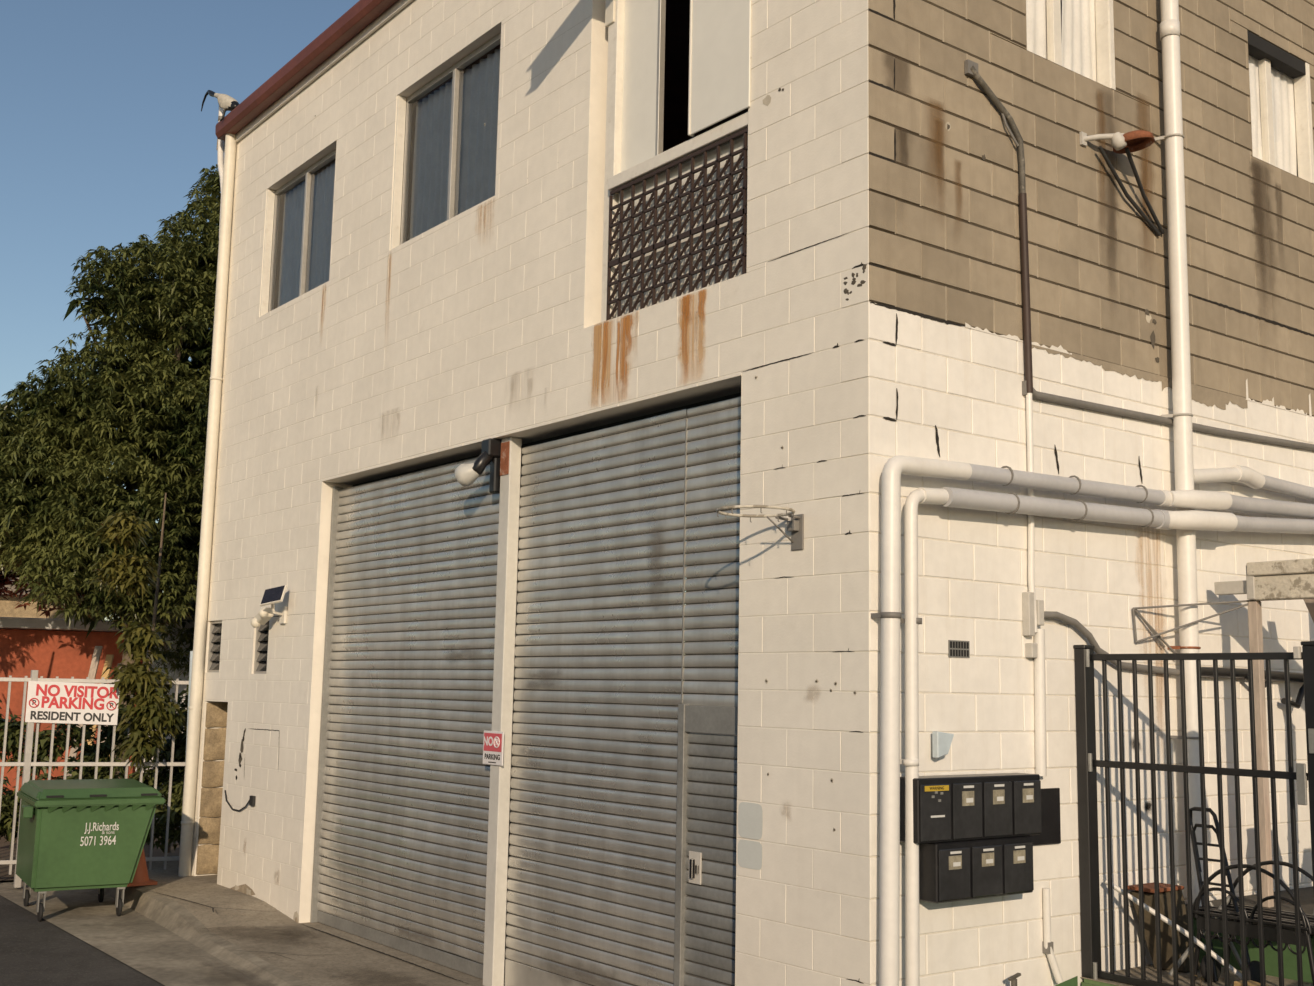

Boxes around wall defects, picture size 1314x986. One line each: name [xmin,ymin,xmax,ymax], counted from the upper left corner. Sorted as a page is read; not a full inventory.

spalling [844,264,867,301]
rust [593,315,632,386]
rust [680,290,705,362]
peeling [965,309,1172,391]
peeling [1191,384,1307,415]